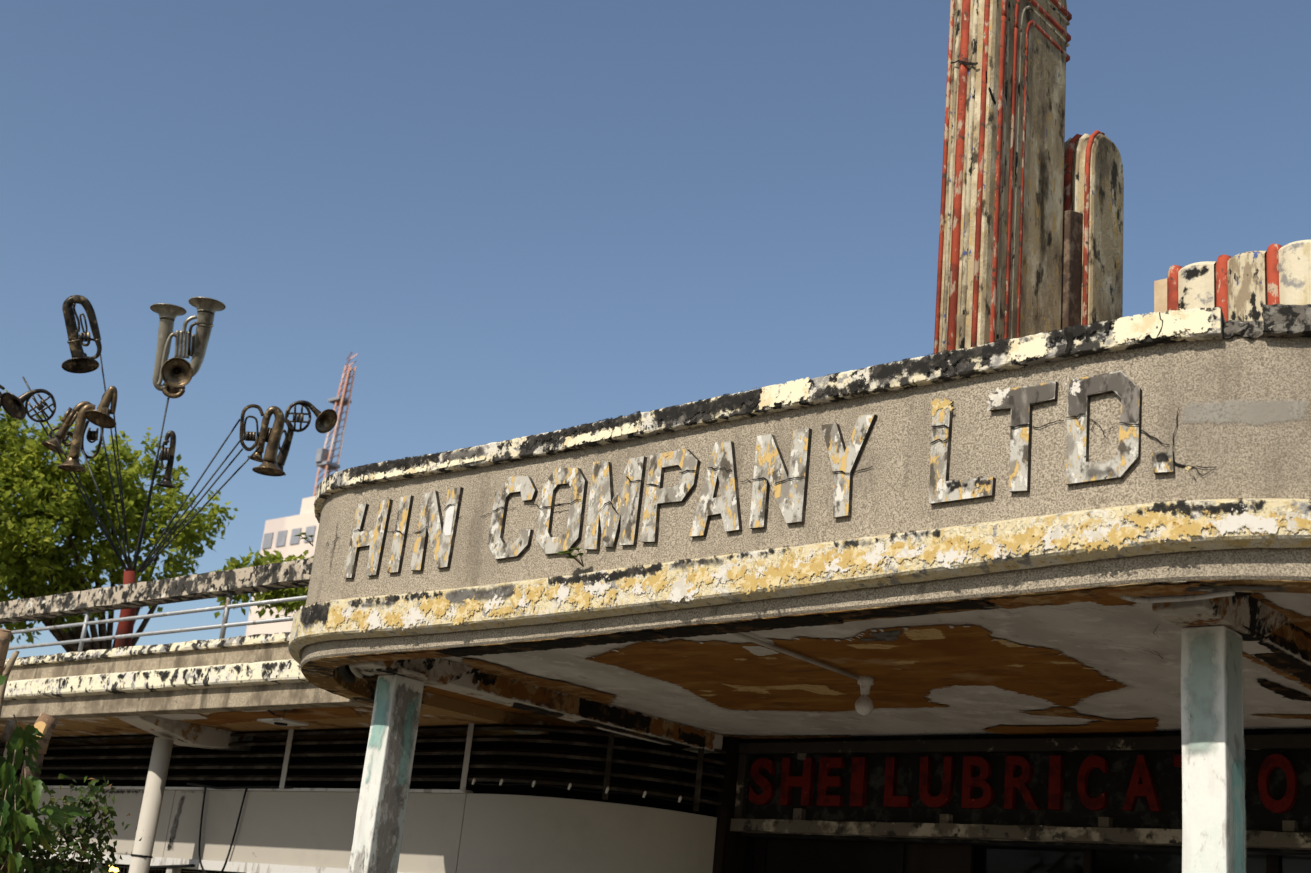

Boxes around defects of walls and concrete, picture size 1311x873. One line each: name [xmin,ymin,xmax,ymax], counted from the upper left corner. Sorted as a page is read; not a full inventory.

peeling [1112,306,1216,344]
peeling [1008,335,1049,363]
peeling [758,377,811,409]
peeling [931,398,953,417]
peeling [986,387,1010,413]
peeling [1065,376,1081,396]
peeling [564,421,640,447]
crack [1010,408,1213,480]
peeling [347,455,486,485]
peeling [325,504,1311,633]
peeling [154,583,1311,873]